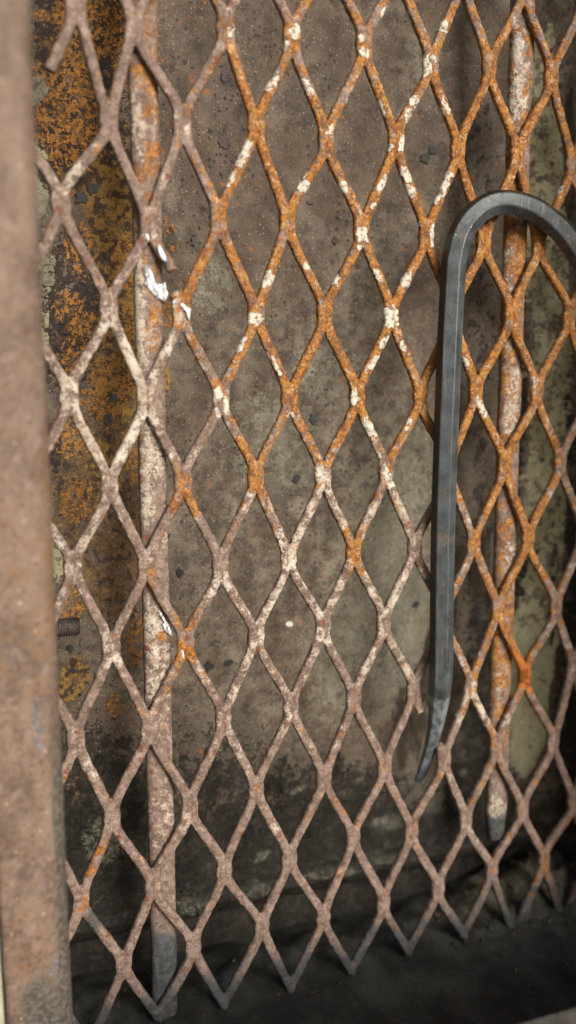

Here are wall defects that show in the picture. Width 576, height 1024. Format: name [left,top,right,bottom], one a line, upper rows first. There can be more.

rust [30,0,143,666]
rust [58,652,93,703]